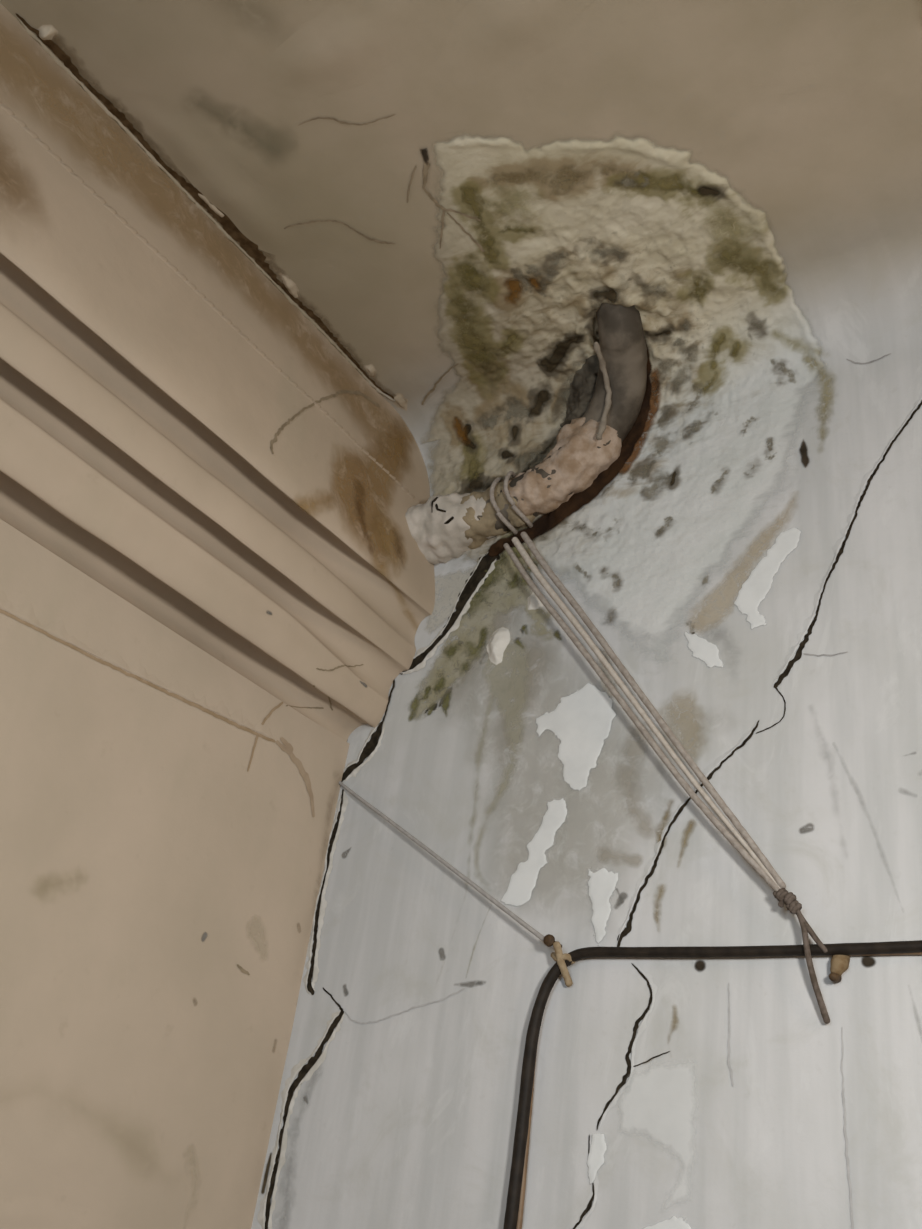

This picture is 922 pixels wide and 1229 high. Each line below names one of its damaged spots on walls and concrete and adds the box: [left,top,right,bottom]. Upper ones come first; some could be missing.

water stain [0,34,396,443]
crack [15,13,459,454]
flaking render [421,136,825,668]
water stain [795,344,832,438]
water stain [409,534,561,743]
water stain [691,519,783,629]
crack [257,550,500,1229]
peeling [501,683,616,906]
peeling [588,868,618,947]
crack [573,392,922,1229]
peeling [587,1134,607,1184]
peeling [619,1065,695,1229]